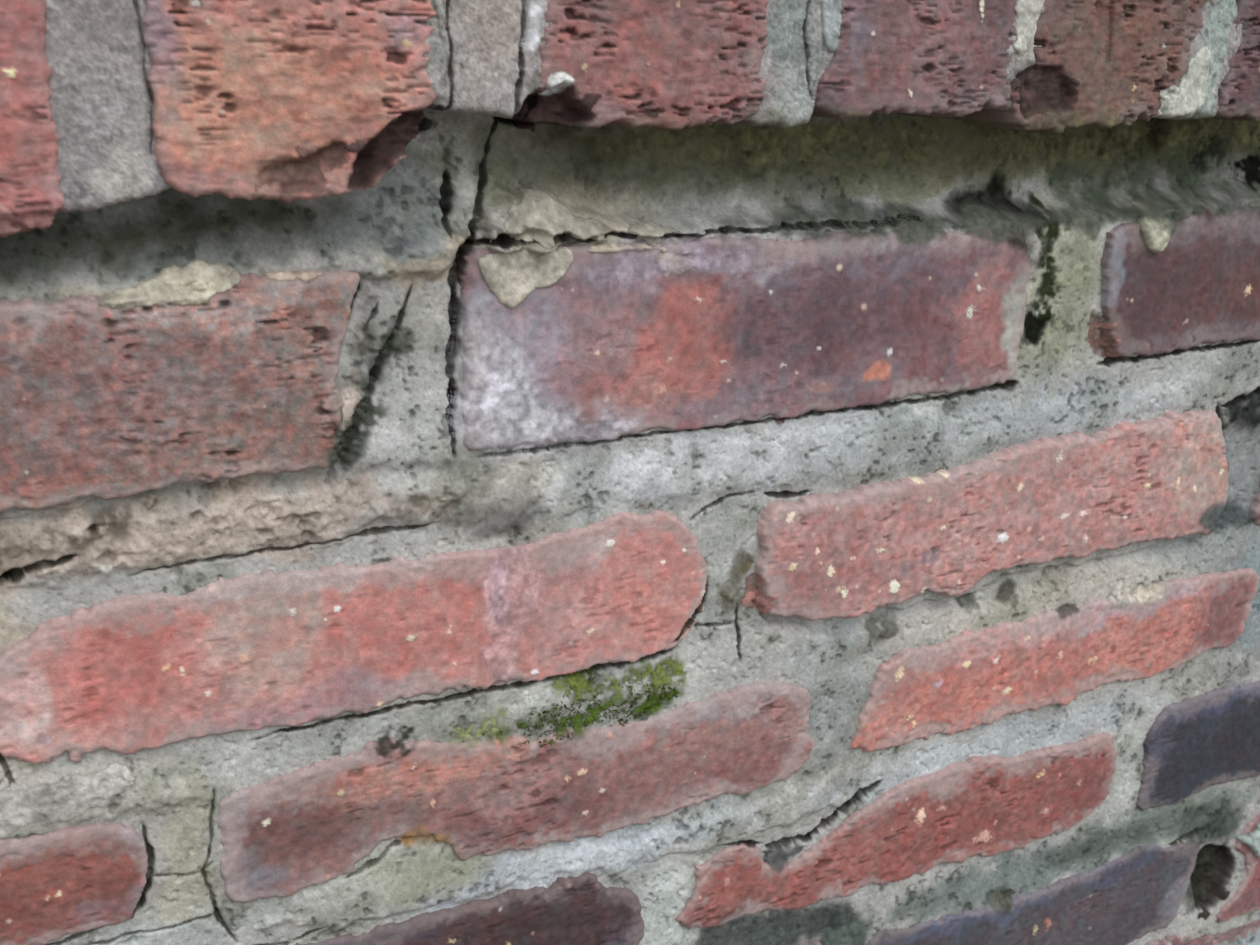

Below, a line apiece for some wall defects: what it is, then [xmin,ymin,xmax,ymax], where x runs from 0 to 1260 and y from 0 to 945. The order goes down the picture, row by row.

crack [445,0,453,110]
crack [439,26,1016,457]
crack [341,284,412,453]
crack [0,555,76,582]
crack [146,524,427,571]
crack [725,780,879,847]